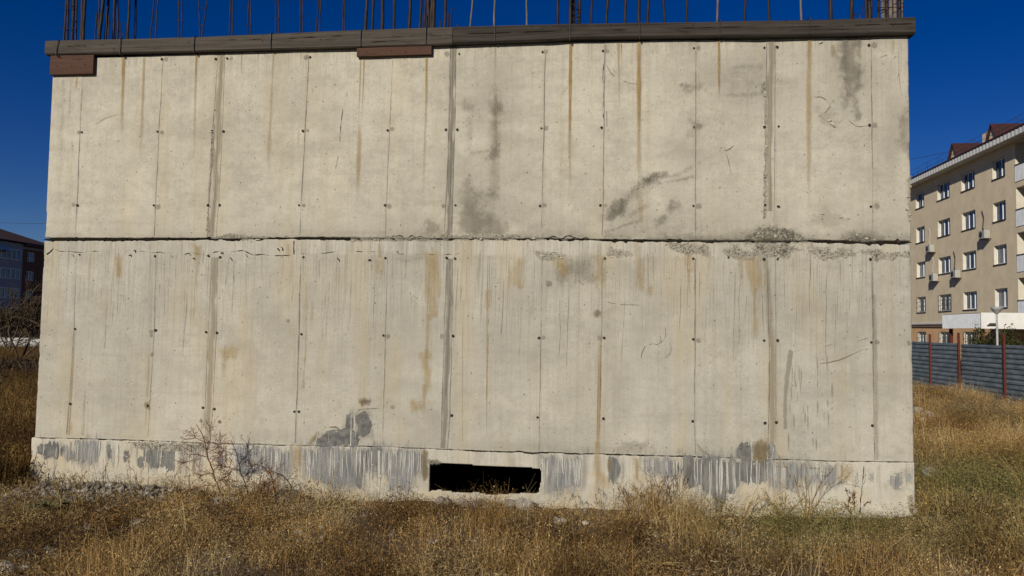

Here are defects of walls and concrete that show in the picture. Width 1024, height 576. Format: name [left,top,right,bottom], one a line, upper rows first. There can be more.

spalling [723,82,913,261]